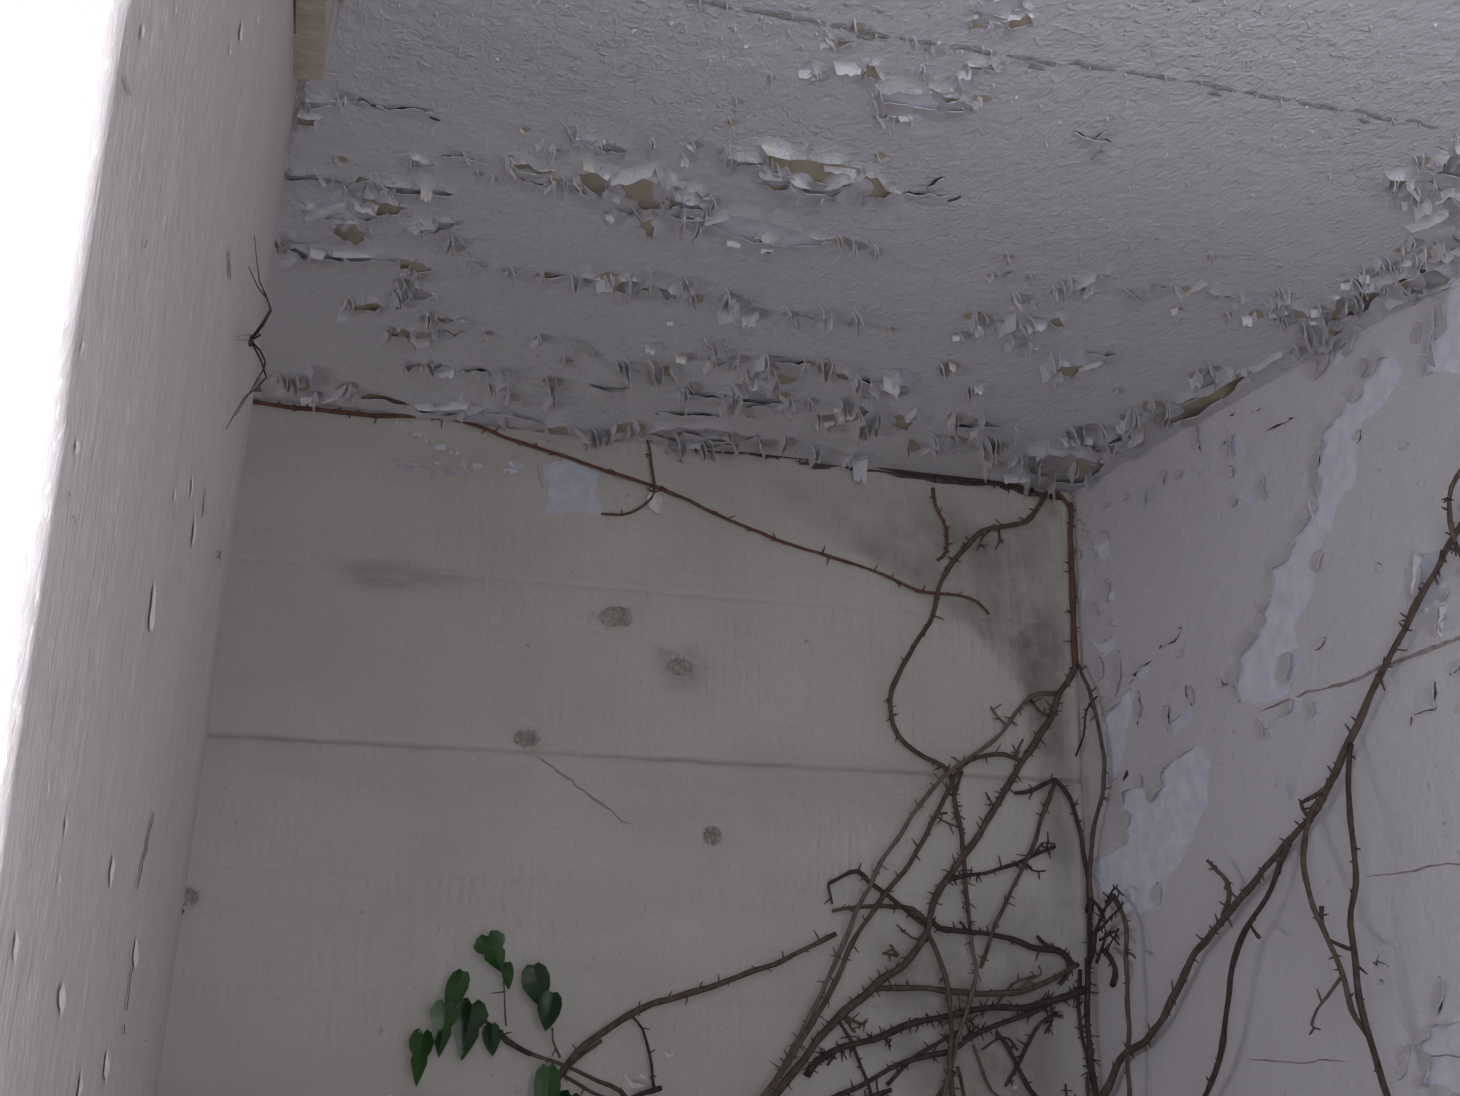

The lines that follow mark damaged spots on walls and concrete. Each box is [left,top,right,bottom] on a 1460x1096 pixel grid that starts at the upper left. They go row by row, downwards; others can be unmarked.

peeling [293,82,355,135]
peeling [798,0,1038,136]
crack [690,0,1440,129]
peeling [254,123,1460,717]
spalling [513,726,542,751]
spalling [701,823,722,849]
peeling [1085,650,1215,917]
crack [1260,634,1460,726]
crack [1366,863,1460,877]
peeling [1406,976,1460,1096]